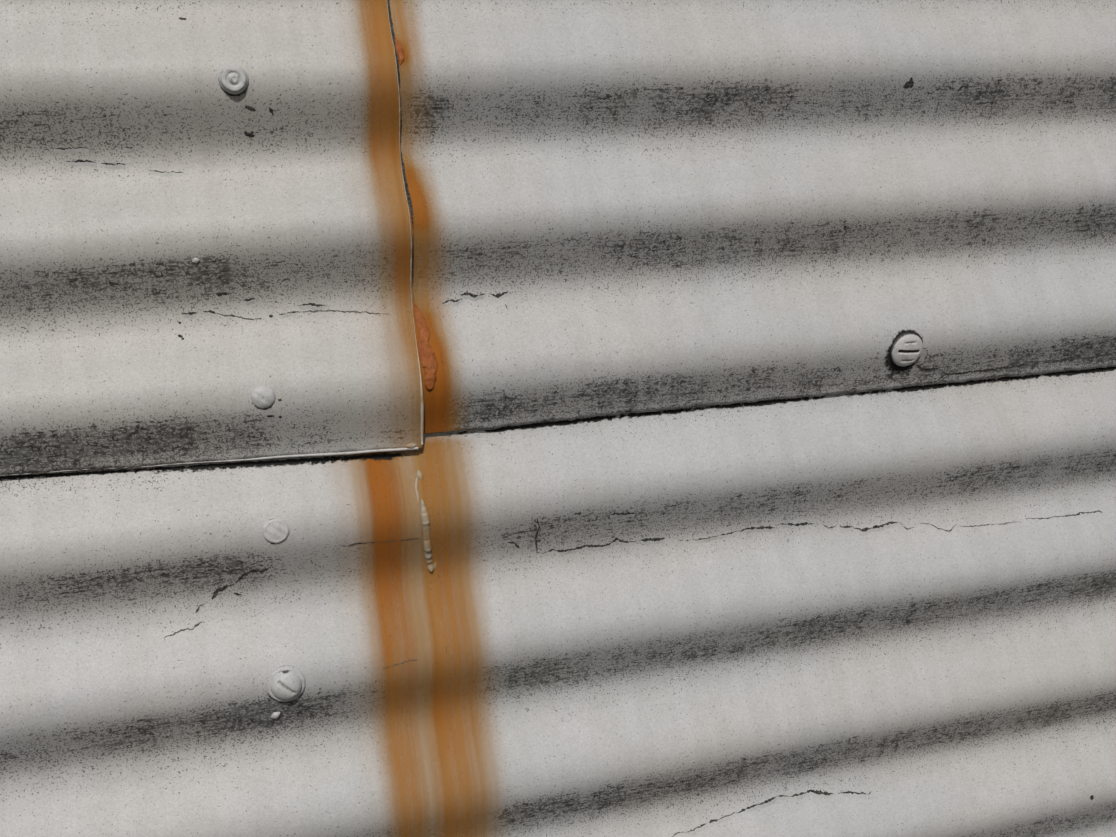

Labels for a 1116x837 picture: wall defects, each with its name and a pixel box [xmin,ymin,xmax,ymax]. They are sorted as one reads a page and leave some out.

crack [387,0,415,306]
crack [182,292,385,320]
crack [442,291,508,308]
rust [360,0,486,837]
crack [508,510,1103,557]
crack [164,567,270,638]
crack [672,789,871,837]